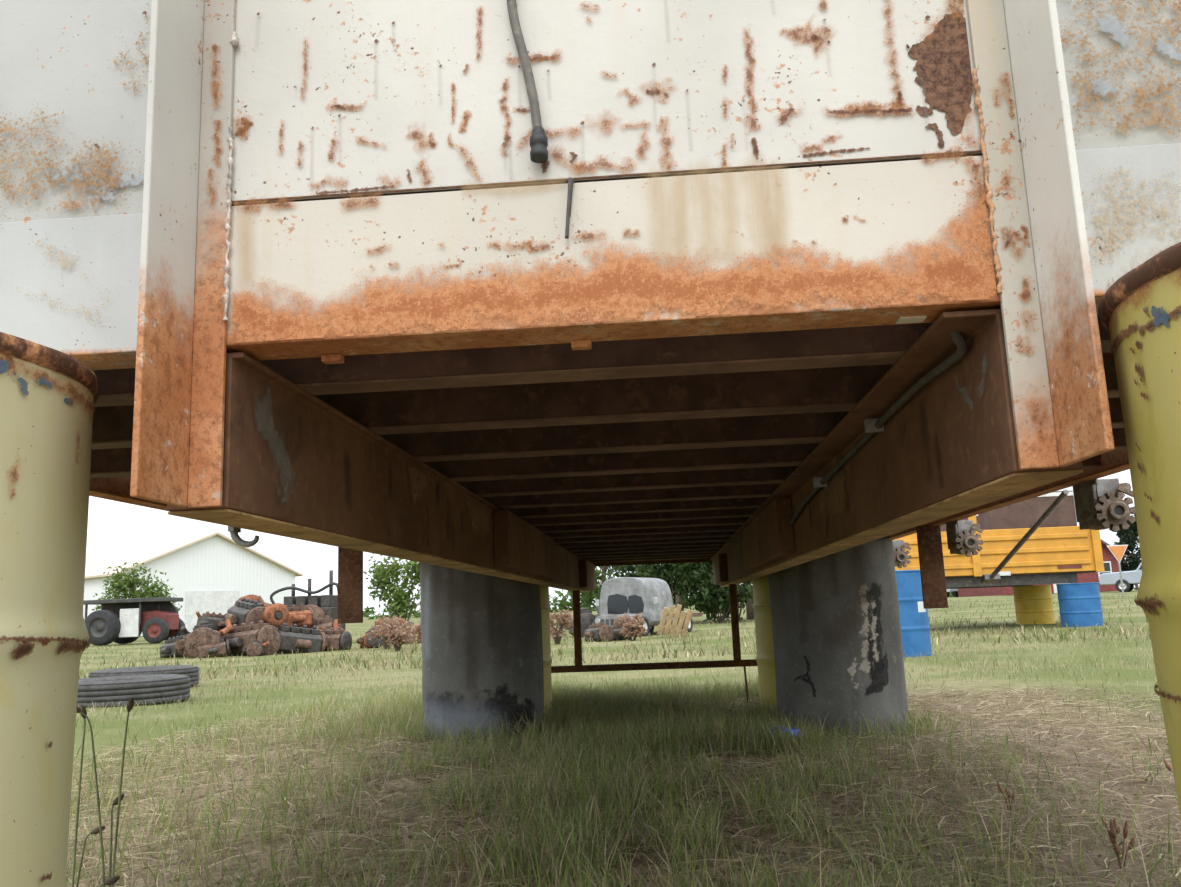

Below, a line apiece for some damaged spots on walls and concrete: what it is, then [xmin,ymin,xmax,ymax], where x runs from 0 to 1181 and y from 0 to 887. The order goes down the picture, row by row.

spalling [847,585,879,689]